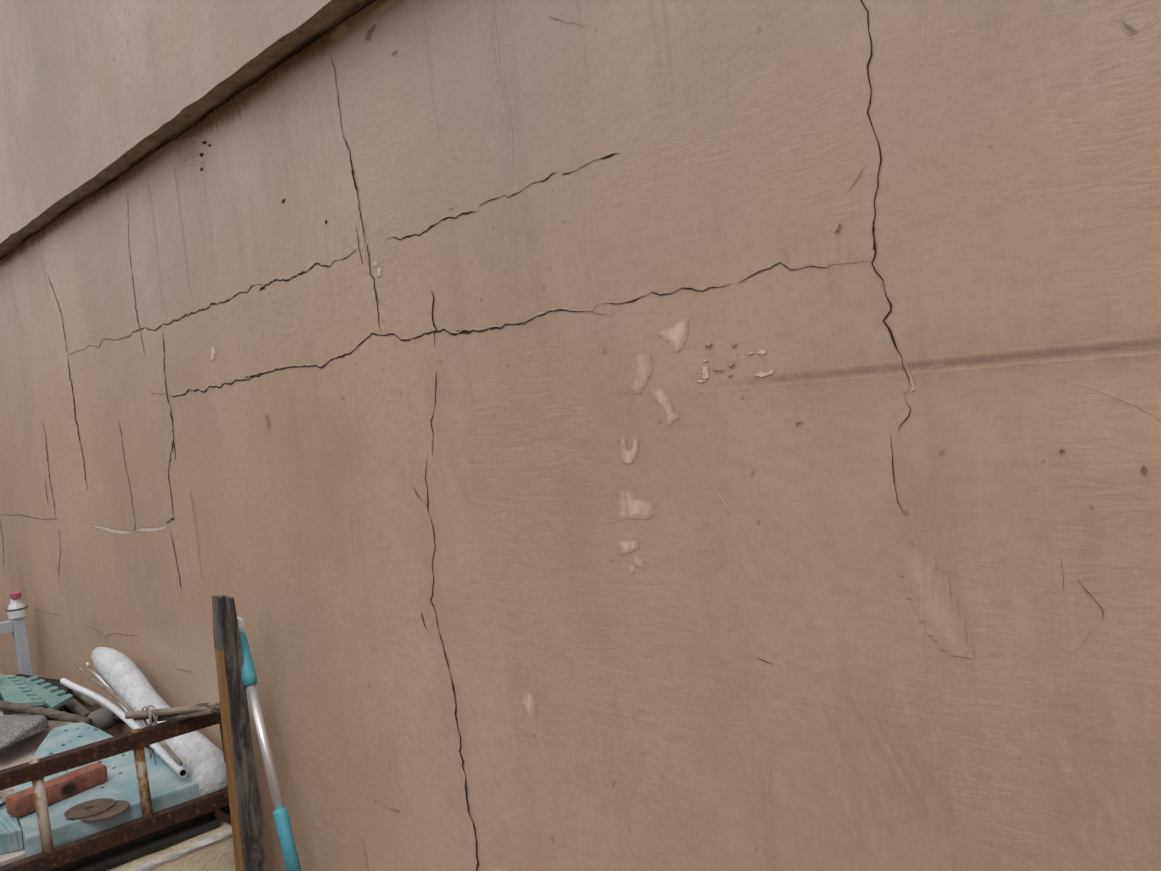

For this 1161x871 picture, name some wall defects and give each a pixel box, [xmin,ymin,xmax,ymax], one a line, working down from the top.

crack [0,0,915,587]
peeling [656,316,689,352]
peeling [618,437,640,464]
peeling [615,487,656,521]
crack [412,378,479,871]